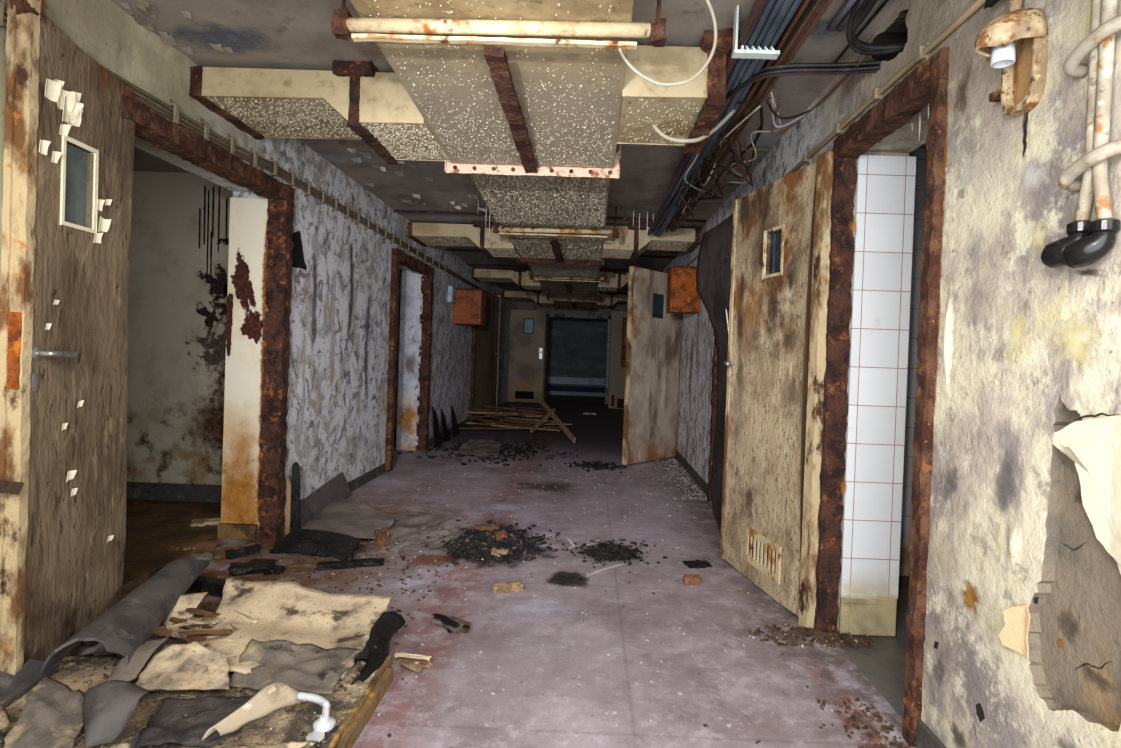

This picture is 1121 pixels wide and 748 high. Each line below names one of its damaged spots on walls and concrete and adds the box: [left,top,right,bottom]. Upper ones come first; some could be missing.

rust [257,223,268,513]
rust [933,109,948,427]
flaking render [999,391,1121,732]